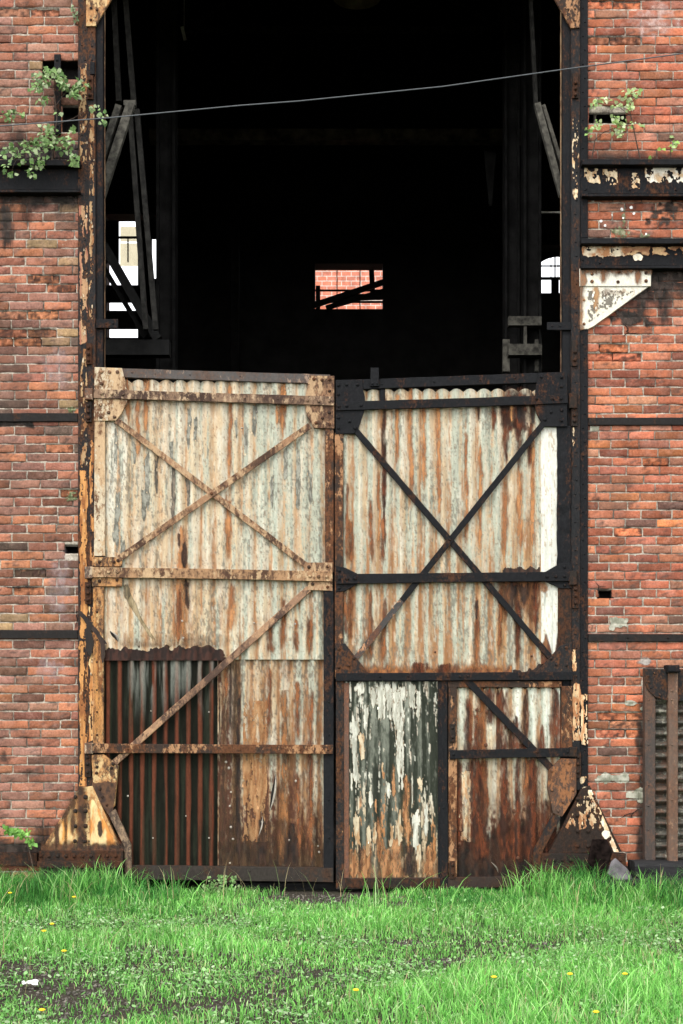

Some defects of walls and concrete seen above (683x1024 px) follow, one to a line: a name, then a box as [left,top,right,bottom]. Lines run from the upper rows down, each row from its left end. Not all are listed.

peeling [631,168,683,189]
peeling [582,246,683,261]
peeling [28,61,95,787]
corrosion [275,384,286,434]
corrosion [224,496,232,556]
corrosion [345,484,354,562]
corrosion [366,388,559,673]
corrosion [77,526,324,867]
peeling [572,649,642,745]
peeling [350,681,429,872]
corrosion [457,687,561,877]
peeling [566,776,619,852]